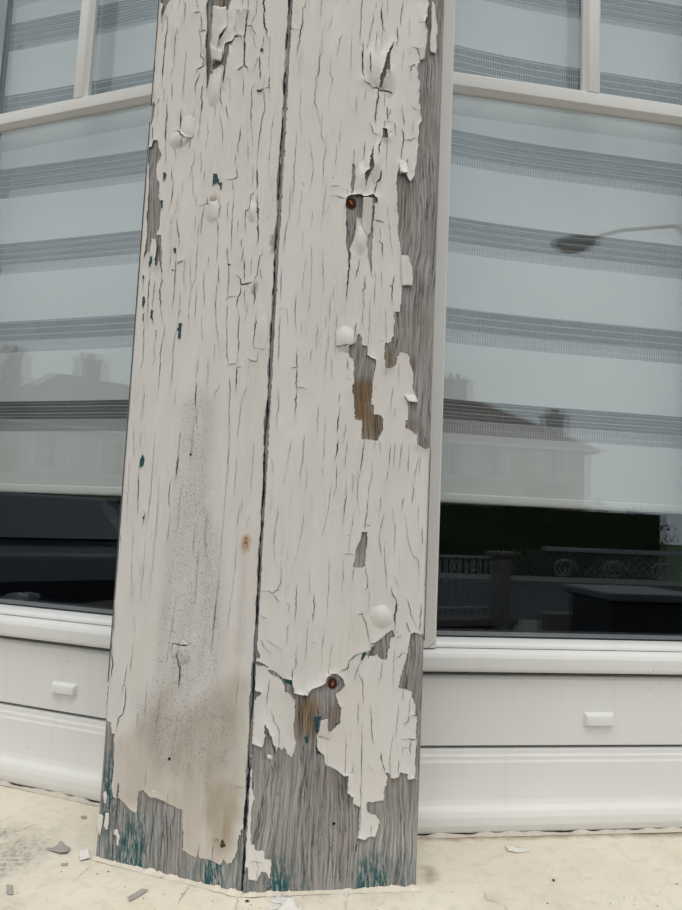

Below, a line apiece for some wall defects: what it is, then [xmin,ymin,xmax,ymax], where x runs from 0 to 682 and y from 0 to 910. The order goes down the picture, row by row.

peeling [207,0,248,83]
peeling [142,141,167,280]
peeling [346,0,443,449]
crack [110,0,423,910]
peeling [79,630,422,910]